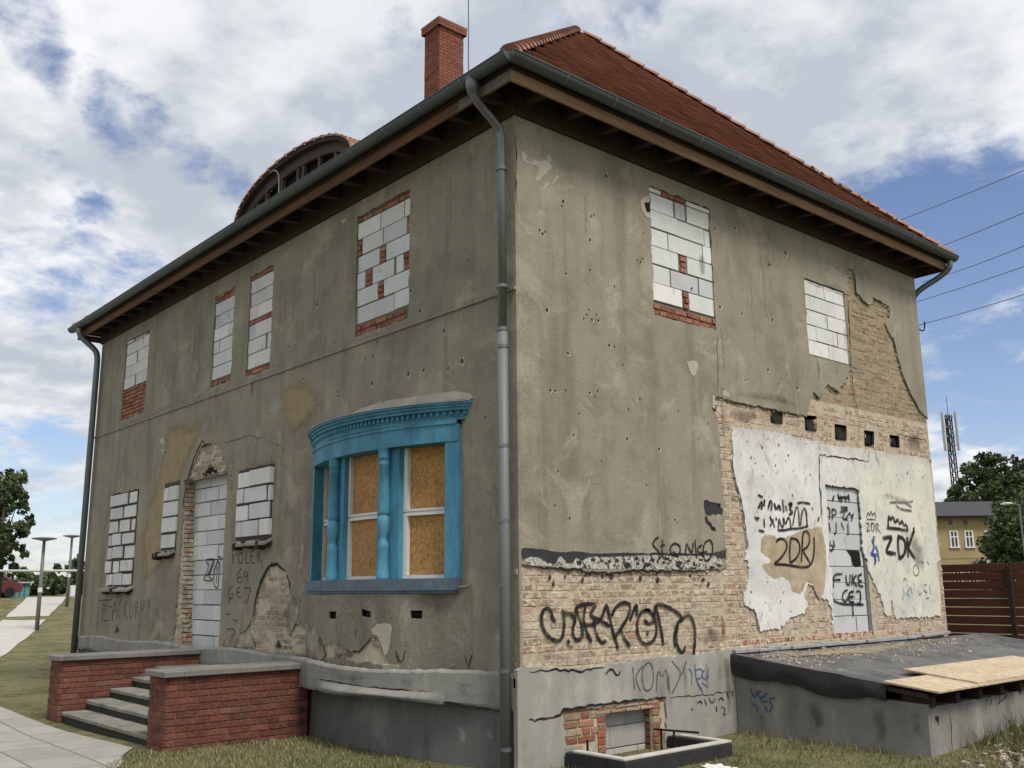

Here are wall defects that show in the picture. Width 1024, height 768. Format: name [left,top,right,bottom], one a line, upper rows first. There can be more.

peeling [144,423,233,575]
peeling [515,269,948,669]
flaking render [226,565,399,669]